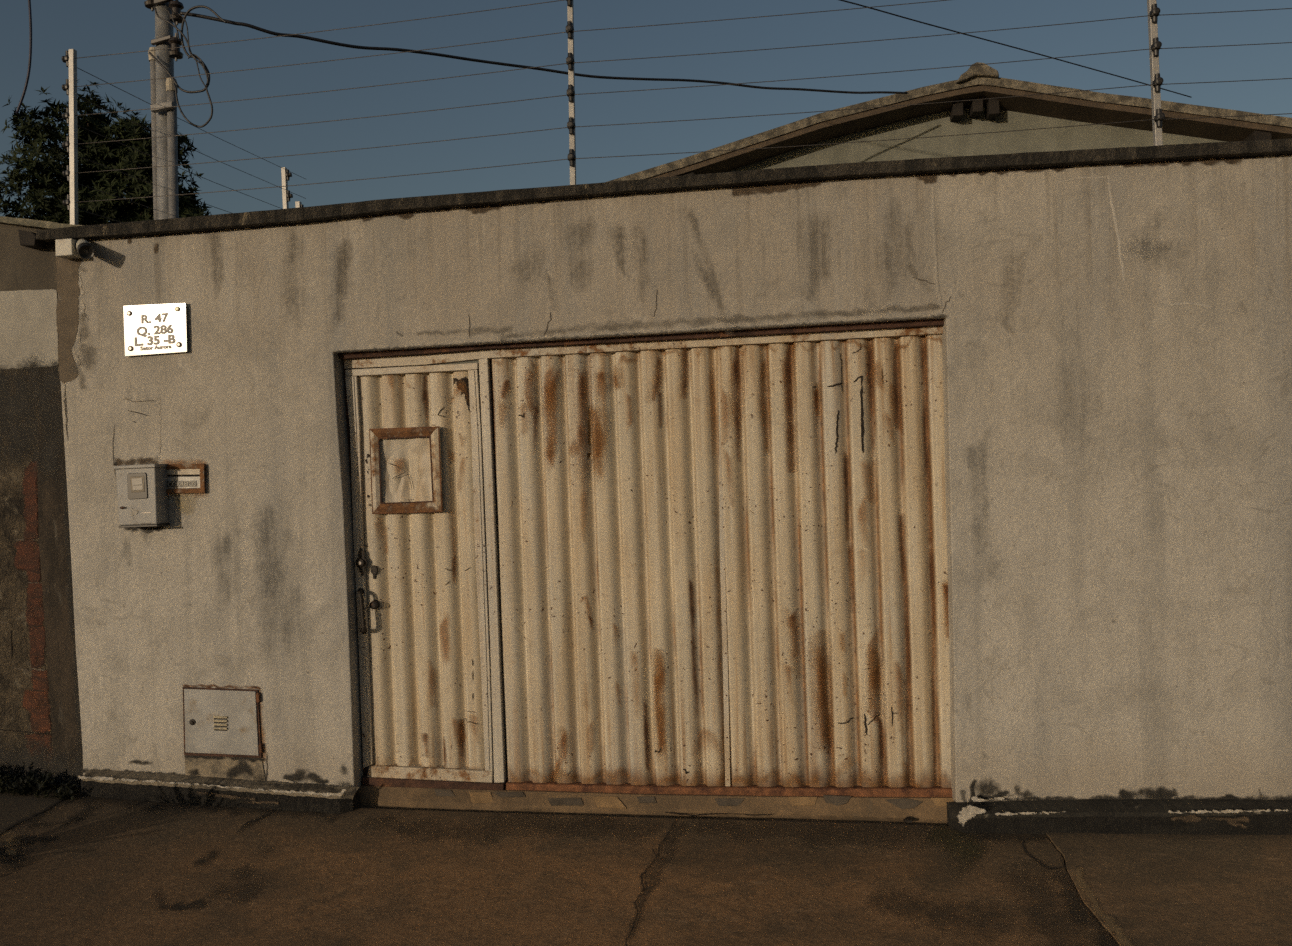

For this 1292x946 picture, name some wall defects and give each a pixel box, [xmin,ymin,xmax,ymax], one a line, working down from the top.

damp [695,176,884,196]
damp [908,166,1070,184]
damp [1091,154,1292,167]
peeling [55,256,91,439]
corrosion [490,364,508,507]
corrosion [785,345,793,441]
corrosion [899,517,910,721]
corrosion [644,666,664,769]
peeling [957,796,1065,826]
damp [961,780,1292,802]
peeling [1168,809,1288,828]
crack [625,812,795,946]